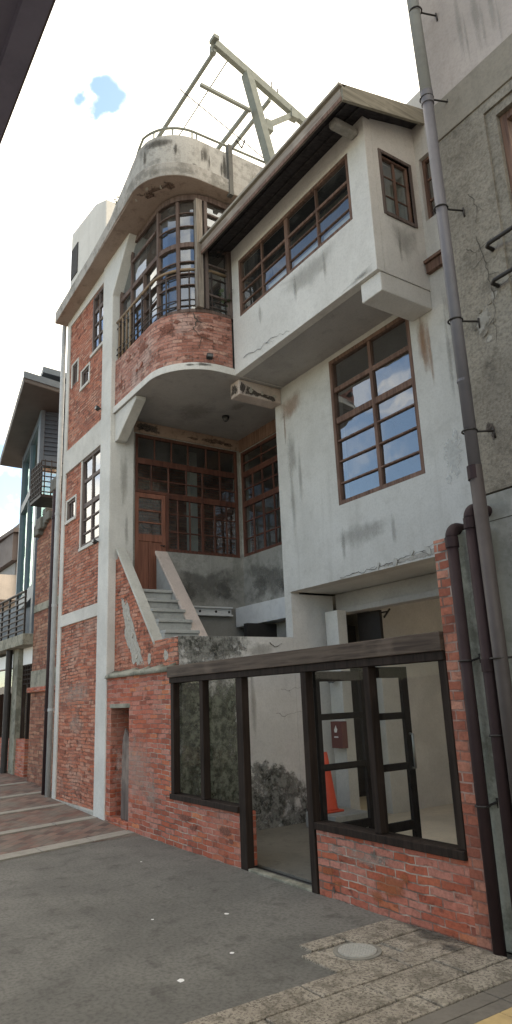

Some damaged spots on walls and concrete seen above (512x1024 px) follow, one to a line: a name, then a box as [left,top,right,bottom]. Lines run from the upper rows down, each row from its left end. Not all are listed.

damp [143,140,177,163]
crack [345,544,433,577]
damp [185,571,231,597]
damp [255,568,284,595]